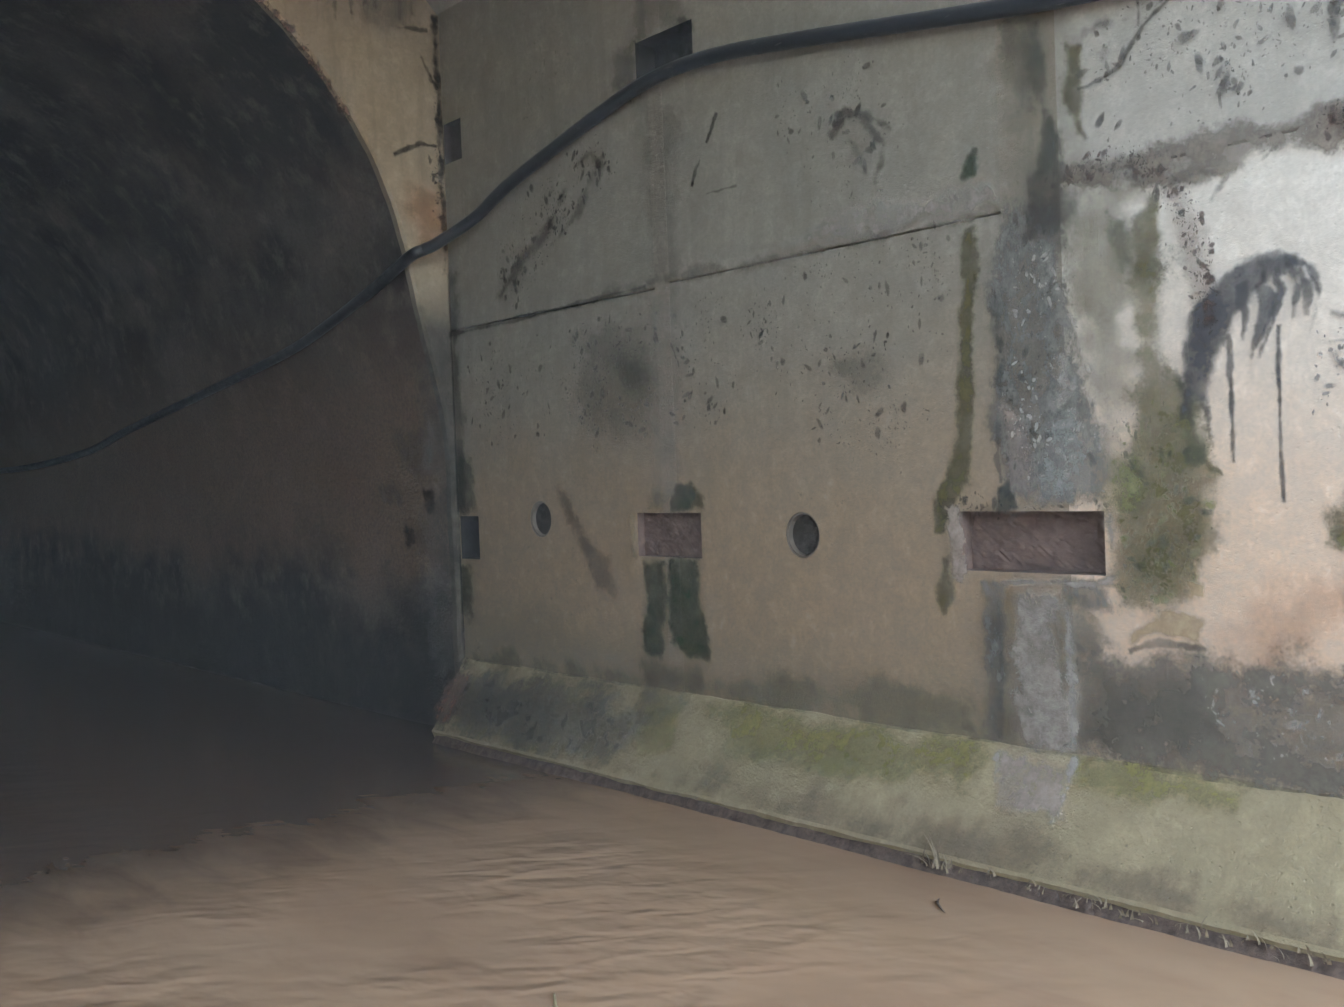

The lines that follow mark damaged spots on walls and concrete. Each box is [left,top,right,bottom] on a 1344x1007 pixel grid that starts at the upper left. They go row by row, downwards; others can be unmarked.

water stain [987,110,1110,513]
water stain [1180,250,1321,461]
water stain [1312,314,1344,414]
water stain [451,650,686,759]
water stain [984,579,1344,816]